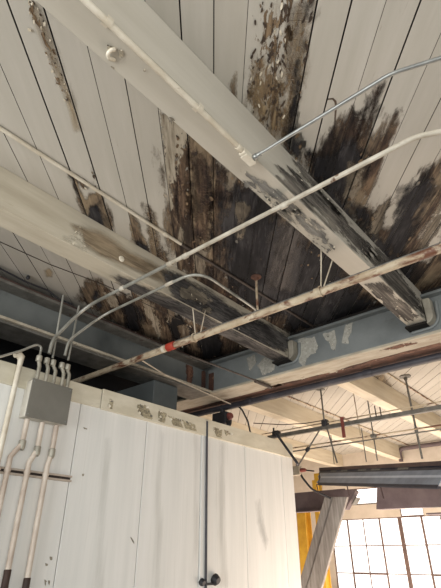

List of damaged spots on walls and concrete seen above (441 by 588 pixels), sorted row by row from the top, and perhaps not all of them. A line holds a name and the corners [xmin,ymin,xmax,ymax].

peeling [247,0,296,142]
water stain [280,0,441,260]
water stain [68,174,113,230]
water stain [129,113,350,312]
peeling [243,158,391,266]
water stain [77,278,208,344]
water stain [179,334,246,361]
peeling [298,336,319,366]
water stain [262,283,382,333]
peeling [323,322,353,350]
rust [338,342,441,371]
peeling [137,404,197,431]